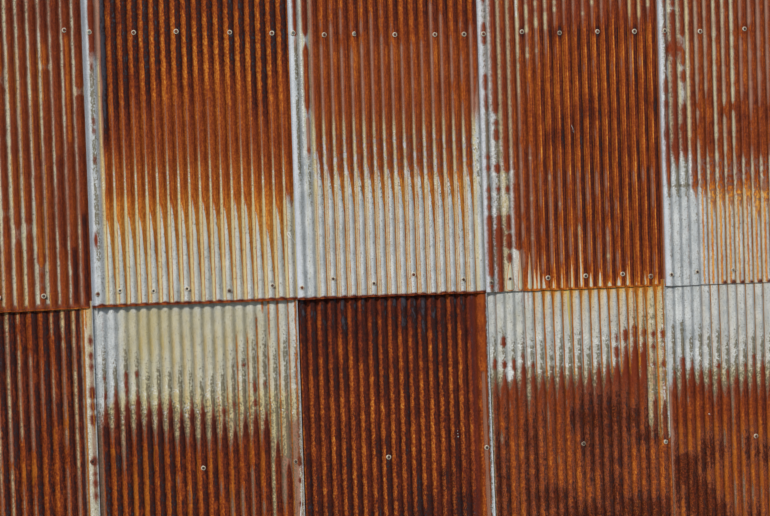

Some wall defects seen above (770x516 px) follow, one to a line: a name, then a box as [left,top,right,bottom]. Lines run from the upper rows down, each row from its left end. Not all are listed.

corrosion [0,0,492,516]
corrosion [481,0,770,516]